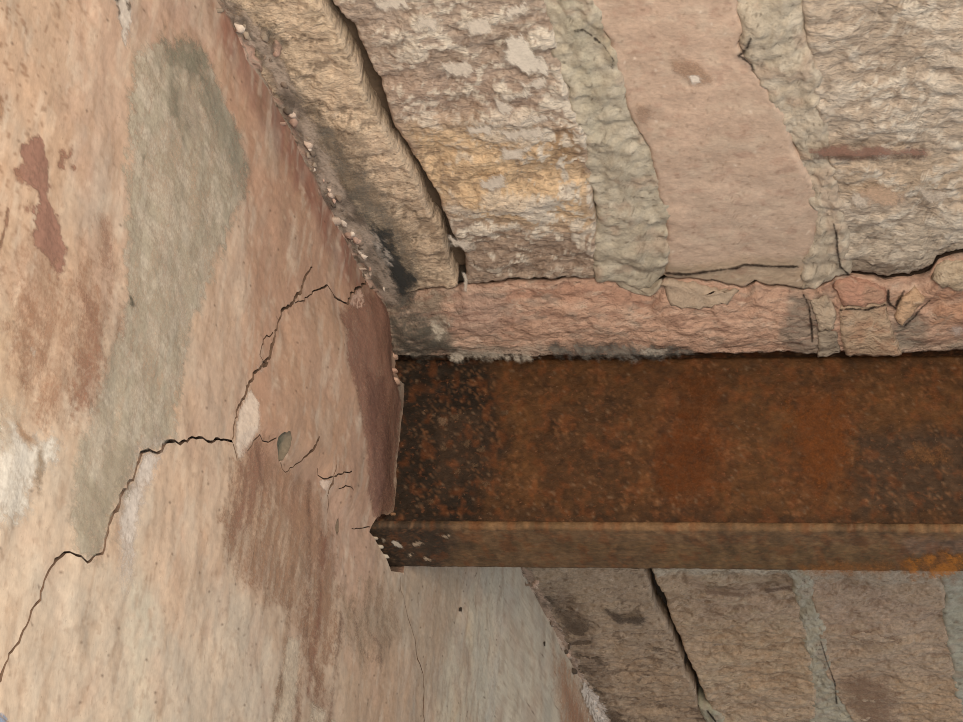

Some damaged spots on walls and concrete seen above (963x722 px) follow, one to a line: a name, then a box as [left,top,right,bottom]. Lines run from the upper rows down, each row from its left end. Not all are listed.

peeling [15,136,76,273]
crack [659,264,799,284]
crack [833,224,963,327]
crack [803,294,813,342]
peeling [236,391,260,458]
crack [0,267,366,682]
crack [651,568,667,605]
rust [901,550,963,581]
crack [675,627,700,685]